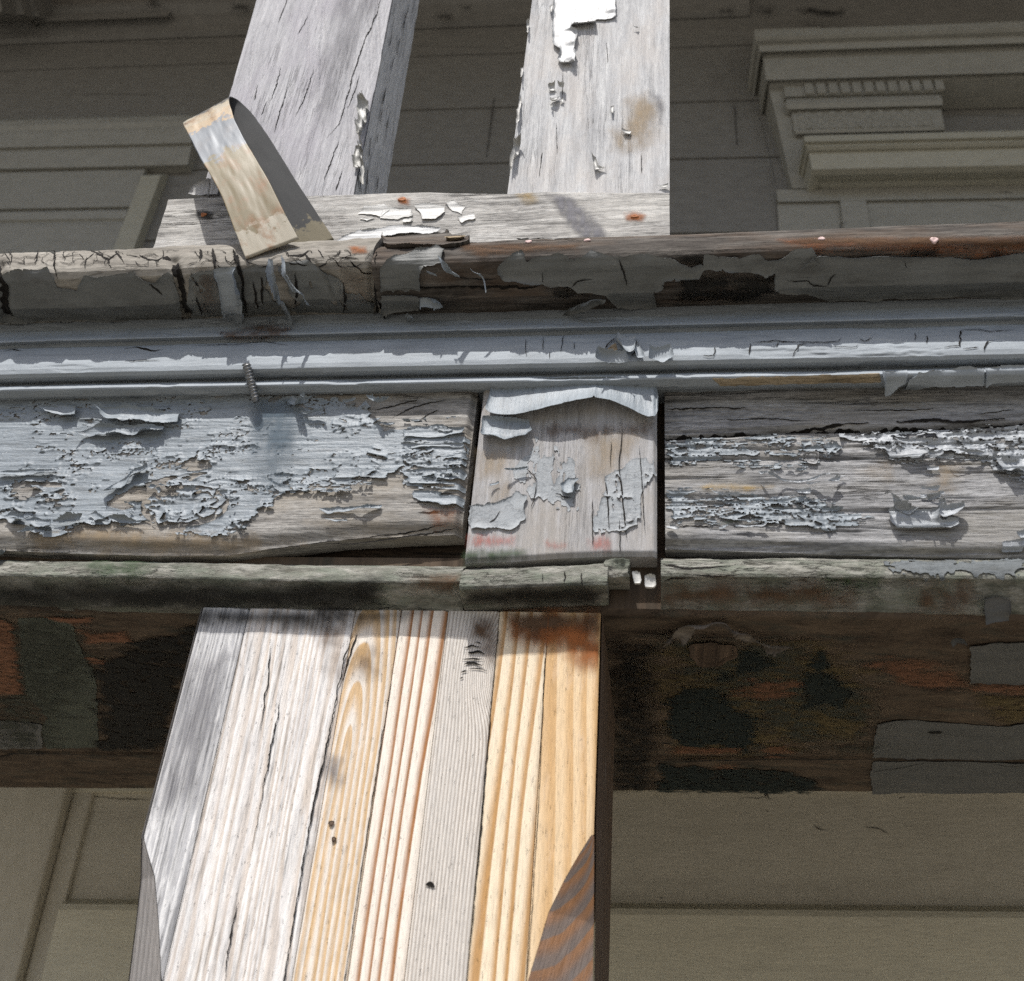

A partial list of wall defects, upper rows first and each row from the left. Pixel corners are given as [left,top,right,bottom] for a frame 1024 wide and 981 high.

peeling [549,0,616,63]
peeling [0,200,486,326]
crack [0,248,544,316]
crack [482,235,581,243]
peeling [497,247,1024,316]
peeling [882,365,1024,396]
peeling [0,376,658,538]
peeling [665,424,1024,531]
crack [250,647,282,856]
leakage [613,646,655,791]
crack [283,635,357,981]
crack [225,901,239,977]